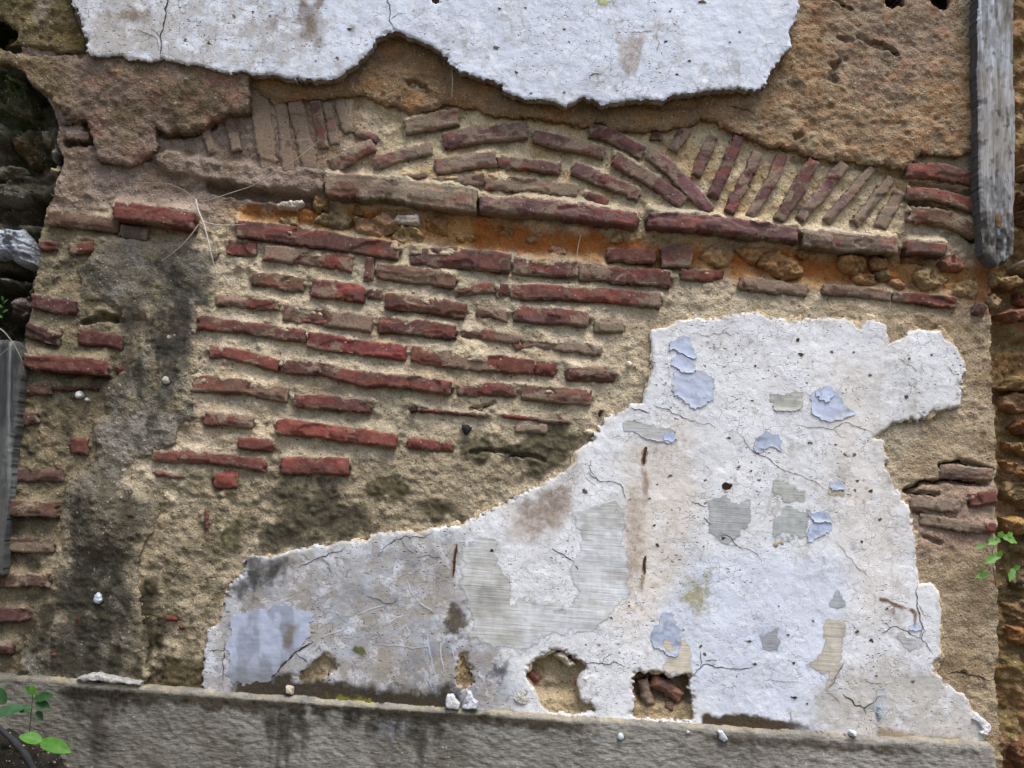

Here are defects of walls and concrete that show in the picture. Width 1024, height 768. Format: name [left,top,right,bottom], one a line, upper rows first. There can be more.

crack [138,0,168,58]
water stain [122,265,206,394]
water stain [213,482,242,549]
water stain [231,478,382,597]
crack [903,459,982,497]
peeling [225,603,313,686]
crack [271,642,313,677]
water stain [27,564,581,760]
spalling [445,656,478,710]
peeling [458,499,633,715]
spalling [631,612,707,734]
crack [881,586,990,681]